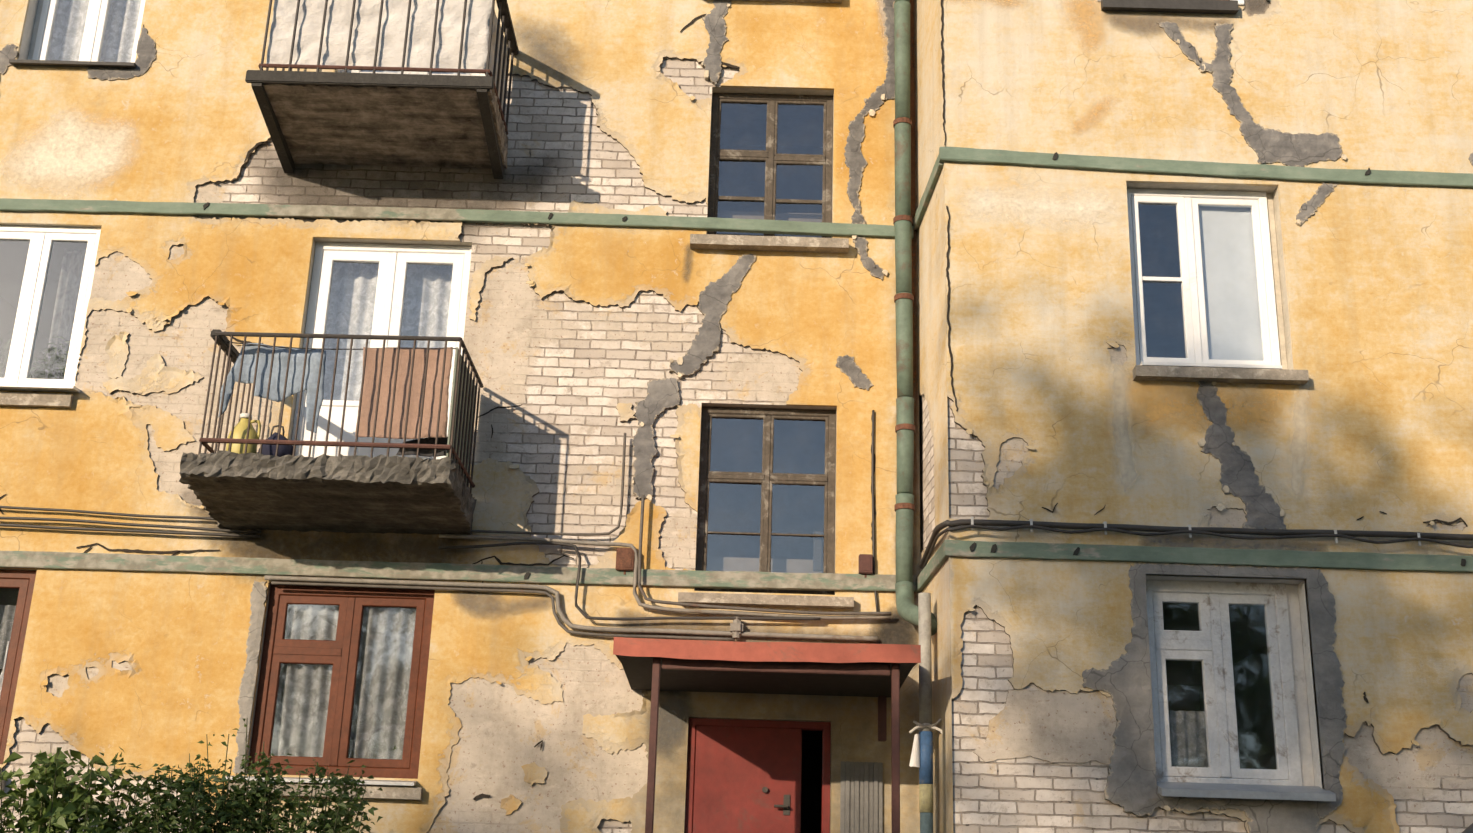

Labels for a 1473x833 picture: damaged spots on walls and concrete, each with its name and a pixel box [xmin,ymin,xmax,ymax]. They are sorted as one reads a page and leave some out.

crack [680,0,739,87]
crack [844,0,895,280]
crack [939,0,947,146]
crack [1159,21,1347,226]
flaking render [75,252,273,509]
flaking render [194,70,802,570]
crack [632,254,756,501]
flaking render [922,395,1036,551]
crack [1196,381,1286,529]
flaking render [0,717,198,833]
flaking render [427,643,648,833]
flaking render [952,605,1247,833]